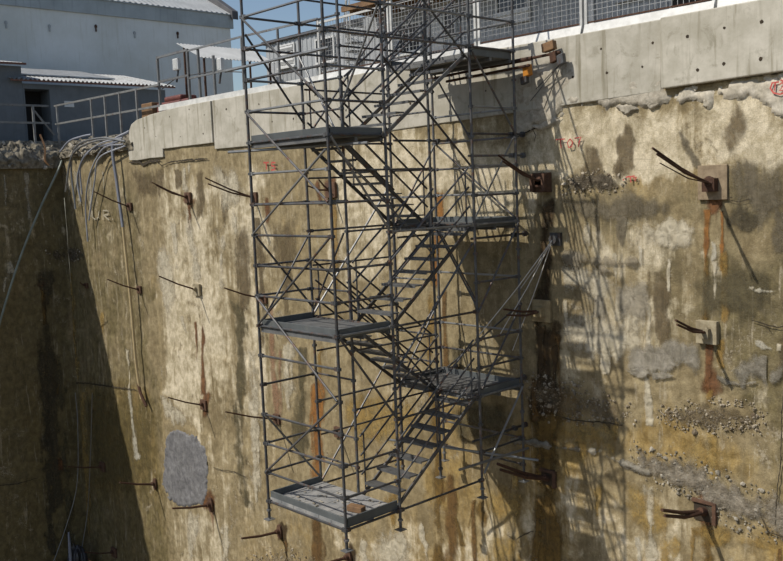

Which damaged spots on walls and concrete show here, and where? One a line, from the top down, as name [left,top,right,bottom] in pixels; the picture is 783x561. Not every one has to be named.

peeling [511,66,783,140]
corrosion [534,199,555,300]
spalling [561,168,626,197]
leakage [563,260,671,374]
leakage [613,126,634,178]
leakage [561,147,692,299]
leakage [695,243,769,320]
corrosion [194,322,210,416]
corrosion [702,340,724,400]
peeling [716,341,782,389]
corrosion [529,321,563,561]
crack [760,397,783,537]